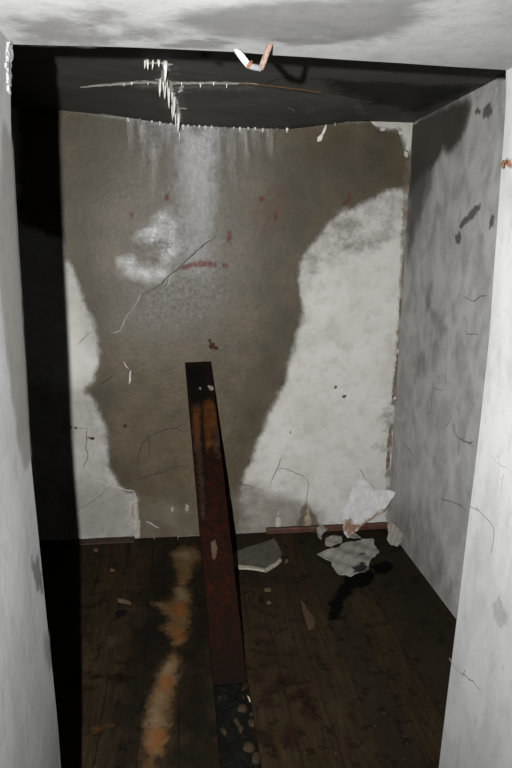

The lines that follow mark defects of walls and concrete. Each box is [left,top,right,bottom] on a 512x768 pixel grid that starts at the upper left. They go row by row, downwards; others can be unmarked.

crack [77,236,217,345]
leakage [16,81,498,538]
crack [40,424,186,537]
crack [232,458,309,507]
crack [442,499,494,553]
rust [157,547,200,645]
rust [144,655,177,768]